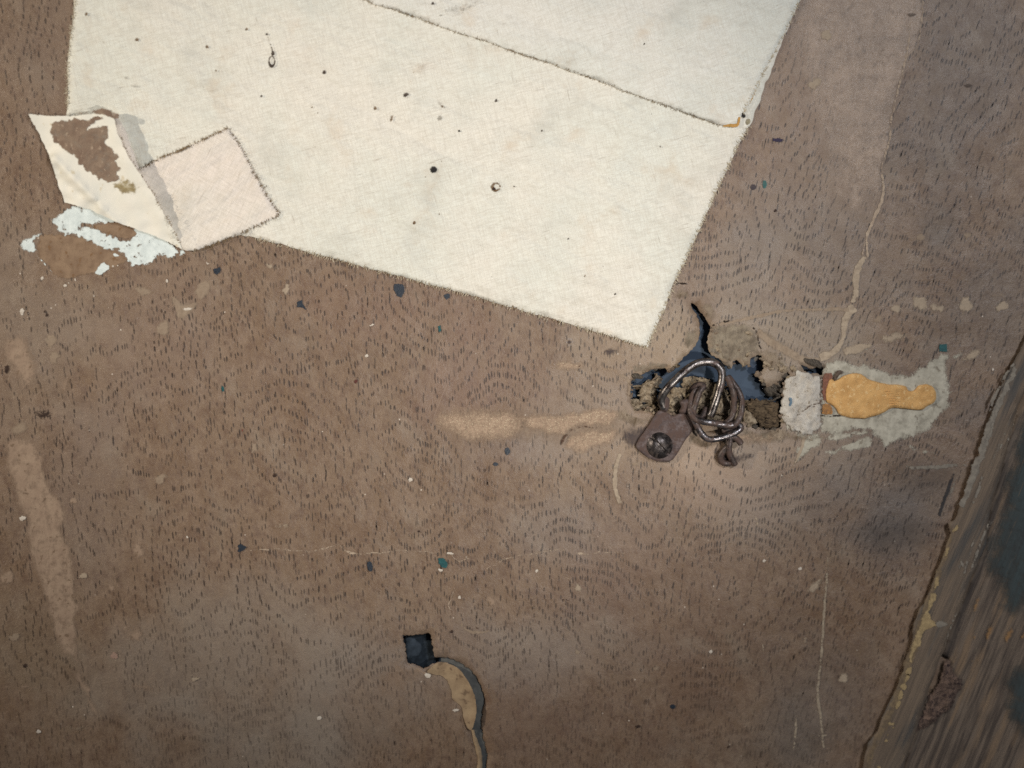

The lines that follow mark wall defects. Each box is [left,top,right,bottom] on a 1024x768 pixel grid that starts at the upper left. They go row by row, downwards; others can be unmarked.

peeling [21,206,196,287]
crack [699,1,924,417]
damp [5,338,36,387]
spalling [619,304,822,444]
damp [7,423,79,655]
spalling [404,633,488,768]